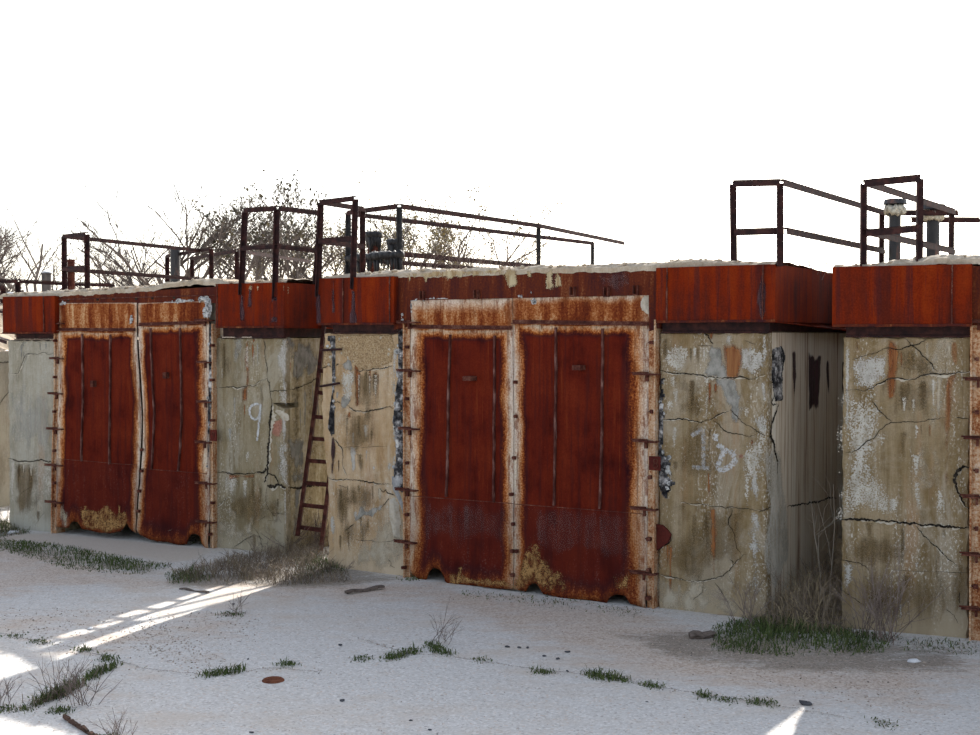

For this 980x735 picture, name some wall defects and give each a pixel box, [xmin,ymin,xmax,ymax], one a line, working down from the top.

crack [216,340,394,547]
spalling [658,343,706,499]
crack [661,354,779,473]
rust [724,345,742,377]
crack [846,337,970,453]
rust [80,505,127,533]
rust [449,544,565,592]
crack [657,465,969,623]